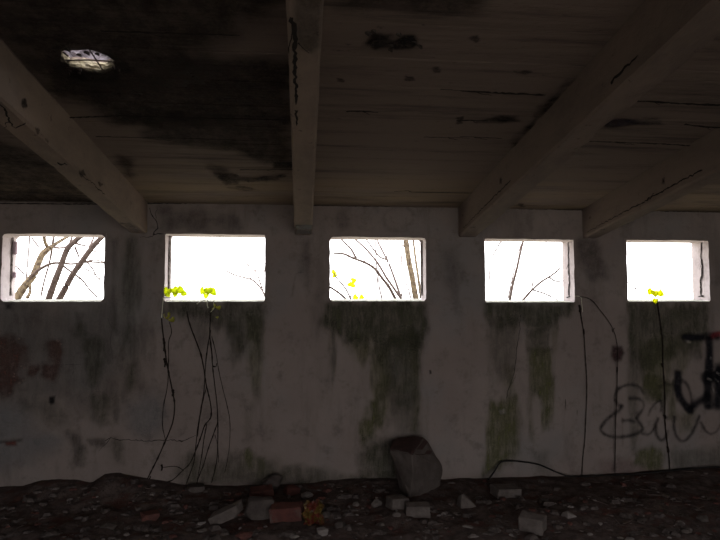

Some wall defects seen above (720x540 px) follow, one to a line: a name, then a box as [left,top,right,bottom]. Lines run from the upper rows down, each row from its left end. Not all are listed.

spalling [61,47,115,72]
water stain [0,0,292,168]
crack [288,17,306,126]
water stain [0,144,94,203]
crack [588,170,702,232]